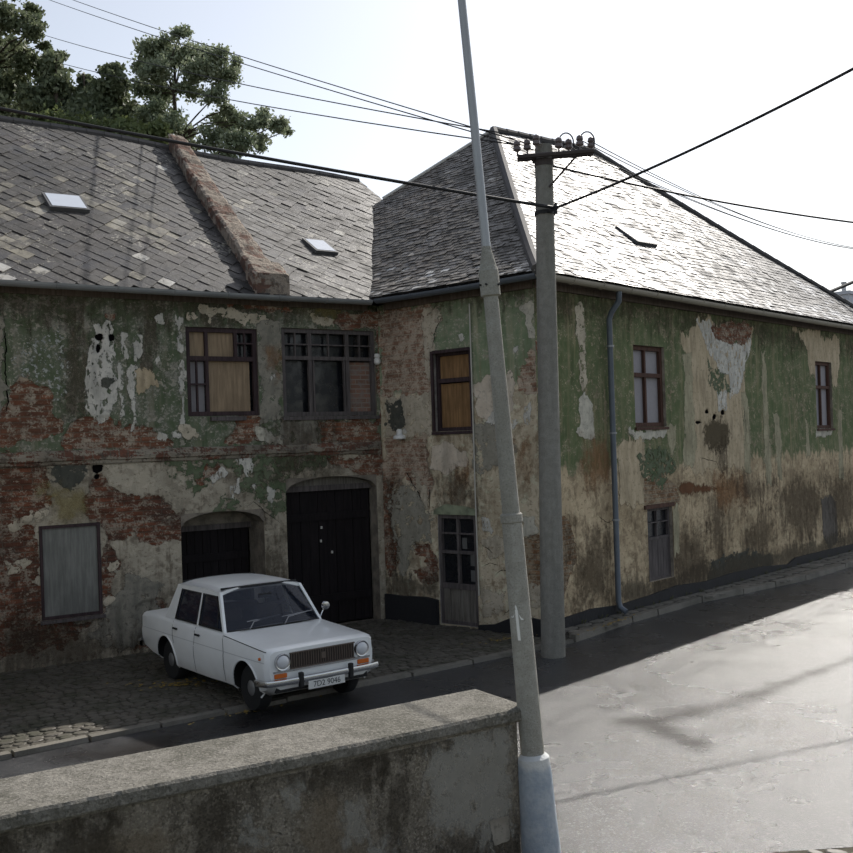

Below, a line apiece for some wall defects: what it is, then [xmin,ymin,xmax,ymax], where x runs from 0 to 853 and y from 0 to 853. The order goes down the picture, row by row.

flaking render [0,316,72,454]
peeling [84,313,160,432]
flaking render [157,304,321,446]
peeling [164,454,331,518]
flaking render [310,304,498,577]
flaking render [506,299,538,430]
peeling [616,314,754,557]
water stain [703,416,730,454]
flaking render [0,465,185,660]
flaking render [413,543,439,584]
flaking render [524,534,540,609]
water stain [621,530,853,601]